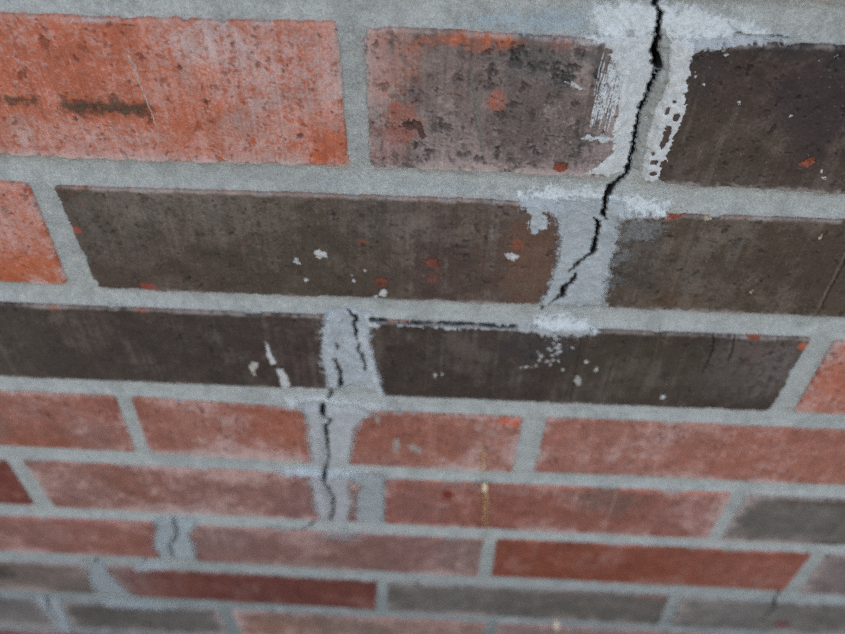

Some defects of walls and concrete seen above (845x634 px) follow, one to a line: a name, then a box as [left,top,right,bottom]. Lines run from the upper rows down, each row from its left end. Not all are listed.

crack [541,0,664,310]
crack [267,309,518,530]
crack [167,519,179,557]